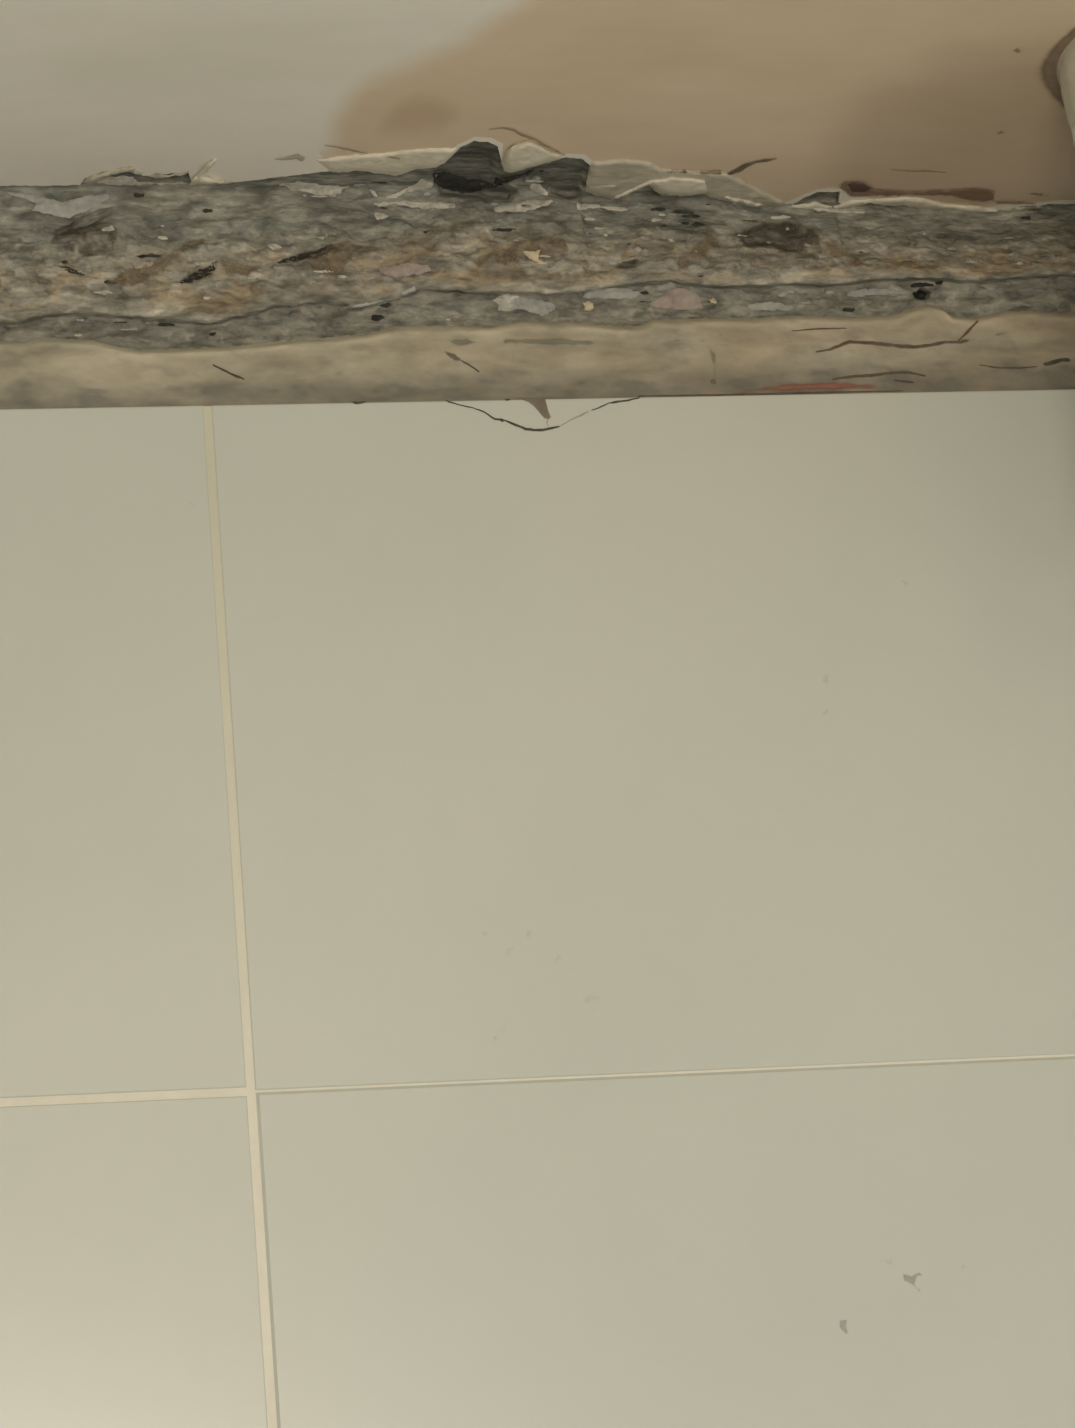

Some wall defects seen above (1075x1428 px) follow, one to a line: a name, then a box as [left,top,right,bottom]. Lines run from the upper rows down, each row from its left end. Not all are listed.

leakage [310,0,1075,207]
spalling [0,141,1075,419]
crack [446,396,641,431]
crack [792,321,1070,383]